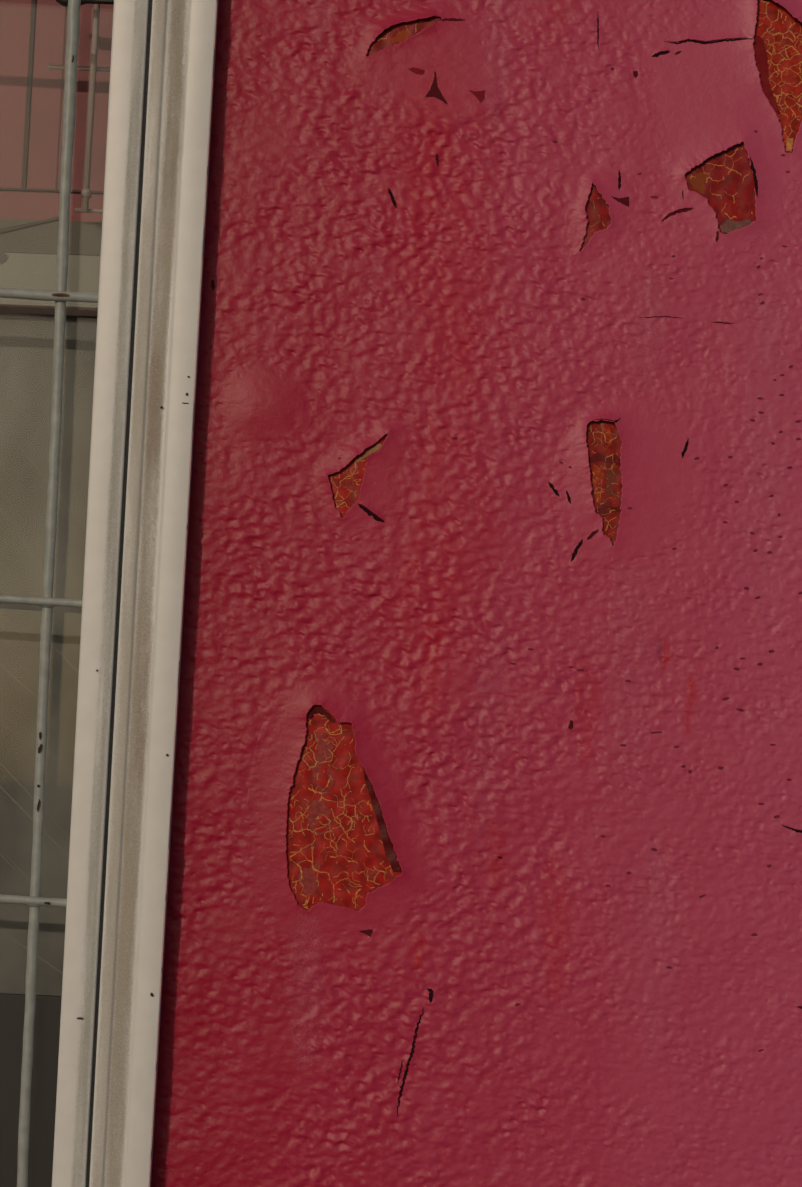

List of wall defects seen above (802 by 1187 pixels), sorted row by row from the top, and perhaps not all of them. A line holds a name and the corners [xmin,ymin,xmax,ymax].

peeling [366,16,442,56]
crack [652,38,753,57]
peeling [753,0,802,156]
peeling [580,183,629,251]
peeling [685,142,756,234]
peeling [328,434,388,518]
peeling [586,420,633,546]
peeling [286,705,402,911]
crack [397,988,433,1117]